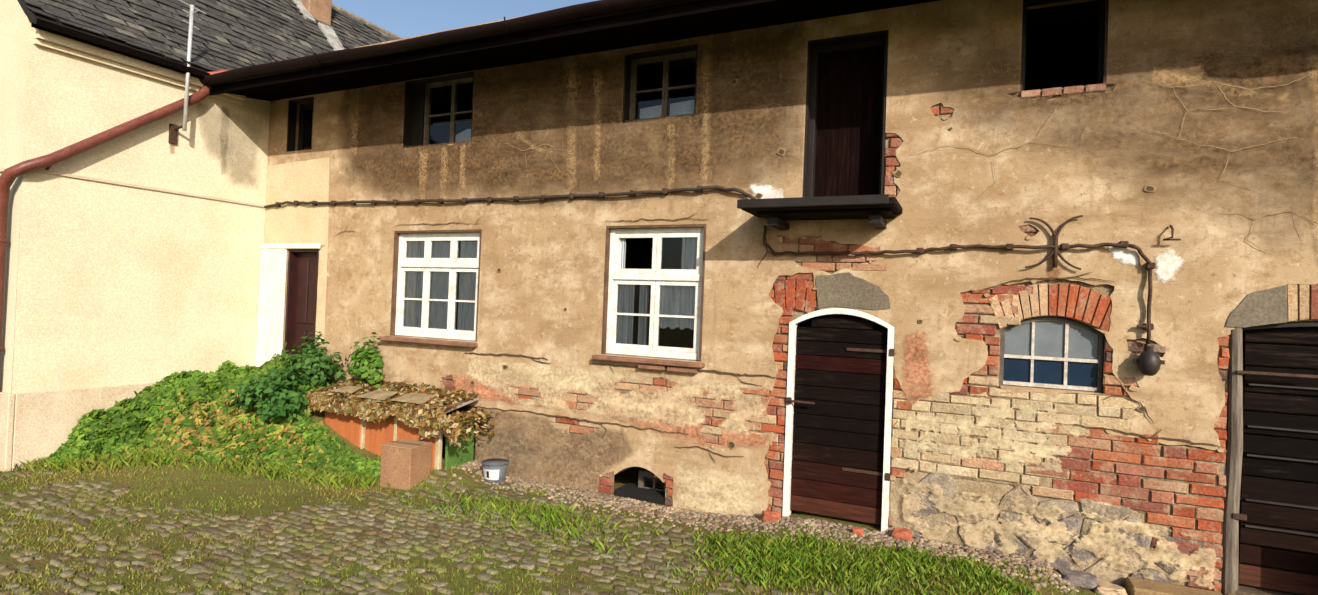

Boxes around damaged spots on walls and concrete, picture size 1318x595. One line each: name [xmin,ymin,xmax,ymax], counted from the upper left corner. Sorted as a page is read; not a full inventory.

leakage [344,30,803,203]
flaking render [884,133,904,198]
flaking render [930,103,955,130]
crack [1130,77,1318,253]
flaking render [439,235,887,517]
flaking render [888,279,1230,593]
flaking render [1287,284,1318,322]